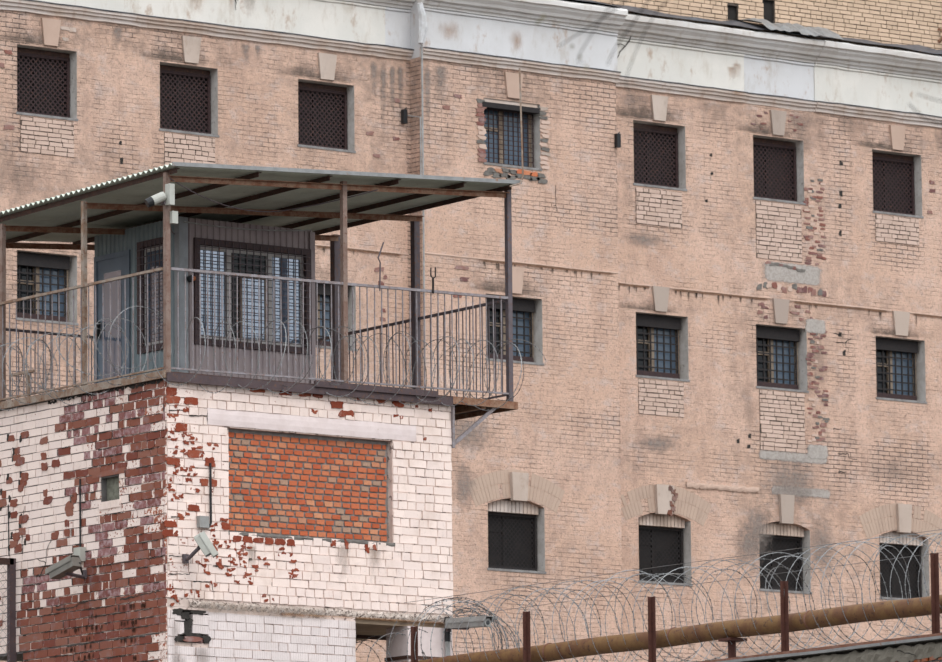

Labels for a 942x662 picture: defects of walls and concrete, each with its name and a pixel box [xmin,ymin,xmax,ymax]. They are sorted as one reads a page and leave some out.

spalling [475,98,551,184]
flaking render [755,177,827,272]
spalling [756,282,827,297]
flaking render [736,305,842,459]
spalling [667,485,678,516]